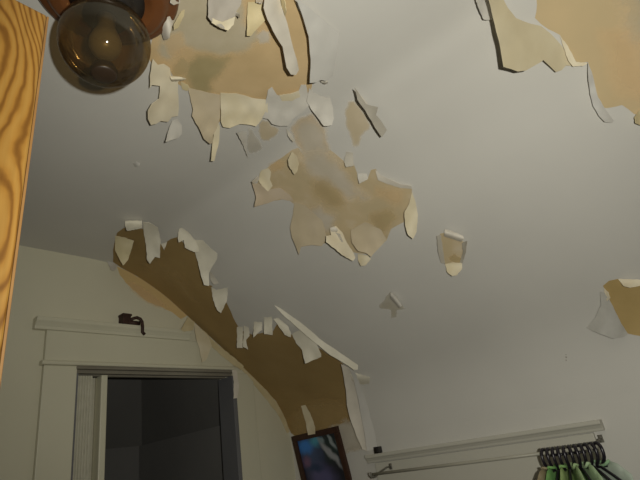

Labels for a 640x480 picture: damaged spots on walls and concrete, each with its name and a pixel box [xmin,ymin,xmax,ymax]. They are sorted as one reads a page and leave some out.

peeling [476,0,640,125]
peeling [148,0,418,266]
peeling [107,220,377,453]
peeling [437,229,467,276]
peeling [586,279,640,339]